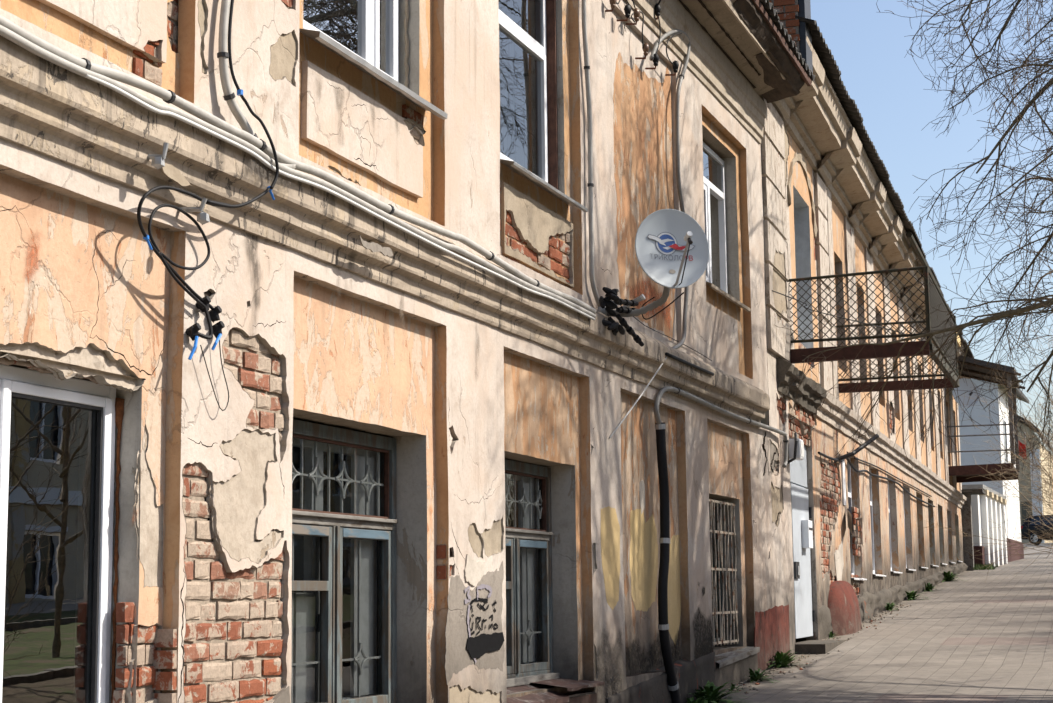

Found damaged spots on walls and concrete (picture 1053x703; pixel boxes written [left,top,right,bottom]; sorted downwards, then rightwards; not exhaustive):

flaking render [133,0,179,87]
crack [328,83,383,168]
flaking render [500,180,573,289]
crack [90,230,167,375]
spalling [0,342,146,392]
flaking render [776,393,817,447]
flaking render [113,327,290,703]
spalling [436,517,504,586]
flaking render [819,455,863,597]
spalling [449,684,502,703]
water stain [597,633,681,703]
water stain [693,608,713,659]